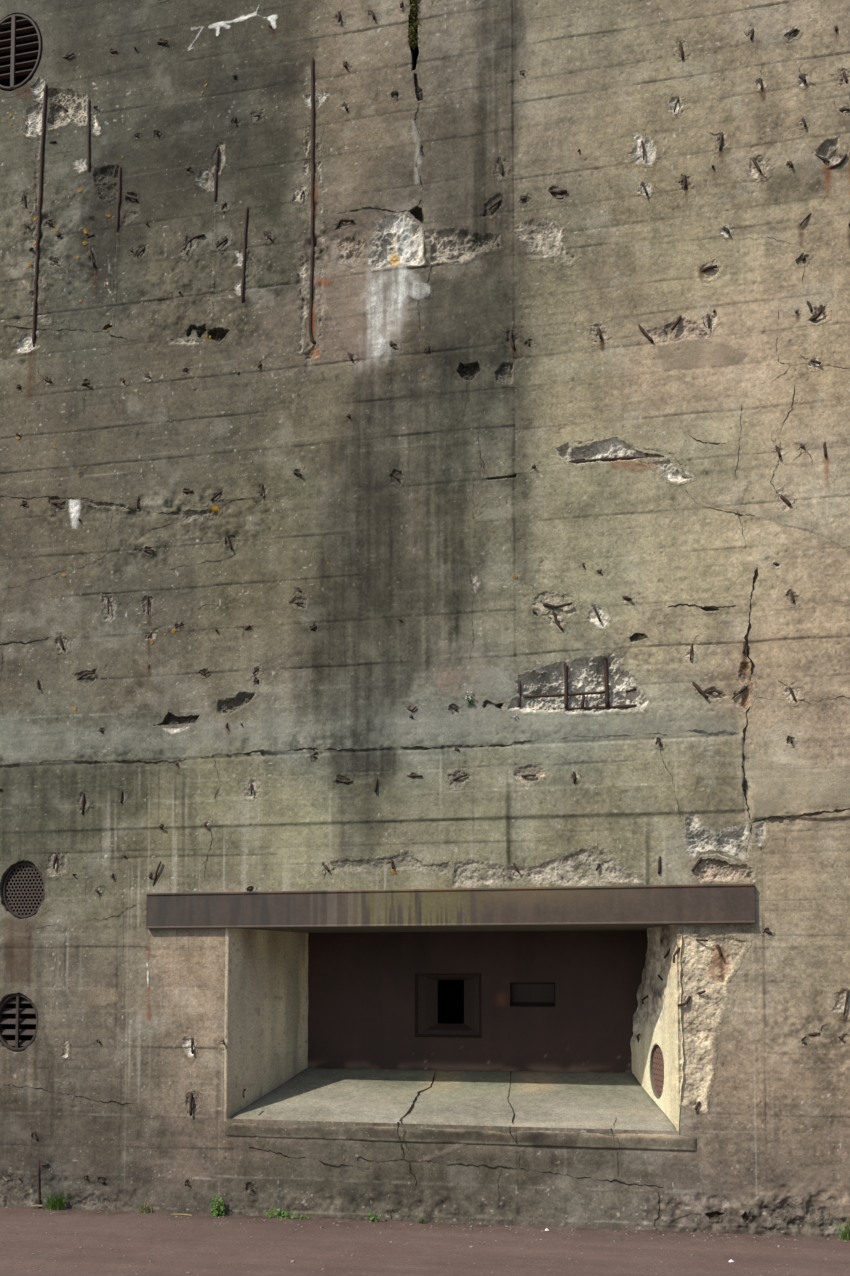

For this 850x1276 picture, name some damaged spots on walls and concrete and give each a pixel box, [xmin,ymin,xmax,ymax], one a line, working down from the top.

crack [378,0,422,73]
crack [5,325,131,361]
spalling [12,75,152,356]
damp [363,284,389,356]
damp [391,220,420,316]
spalling [290,57,582,365]
crack [688,310,850,504]
crack [0,489,850,879]
spalling [480,630,651,717]
spalling [318,840,649,888]
spalling [677,924,775,1115]
crack [248,1071,692,1231]